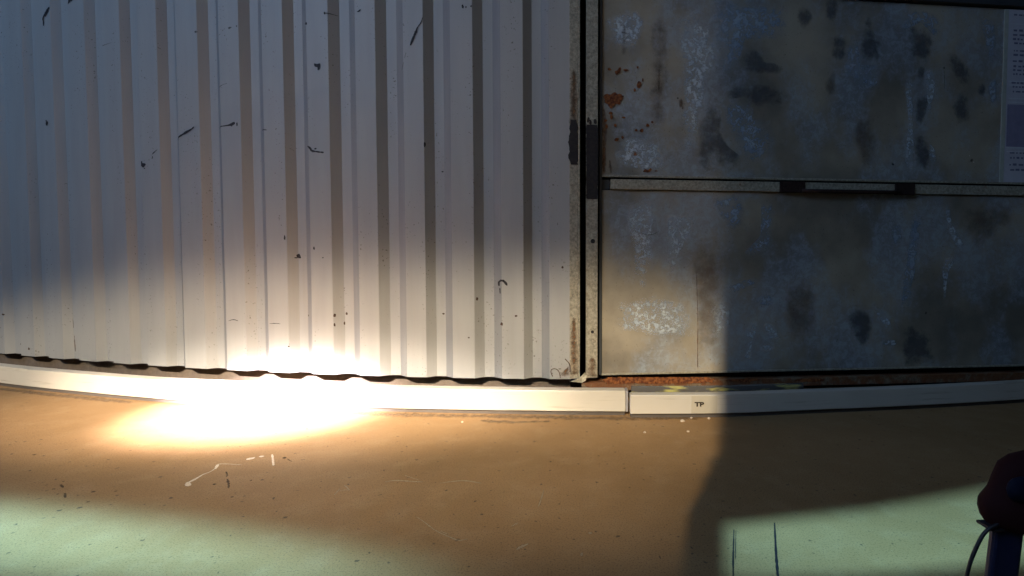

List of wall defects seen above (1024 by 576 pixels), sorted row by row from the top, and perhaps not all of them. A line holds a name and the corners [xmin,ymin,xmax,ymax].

corrosion [604,92,625,141]
corrosion [590,358,761,384]